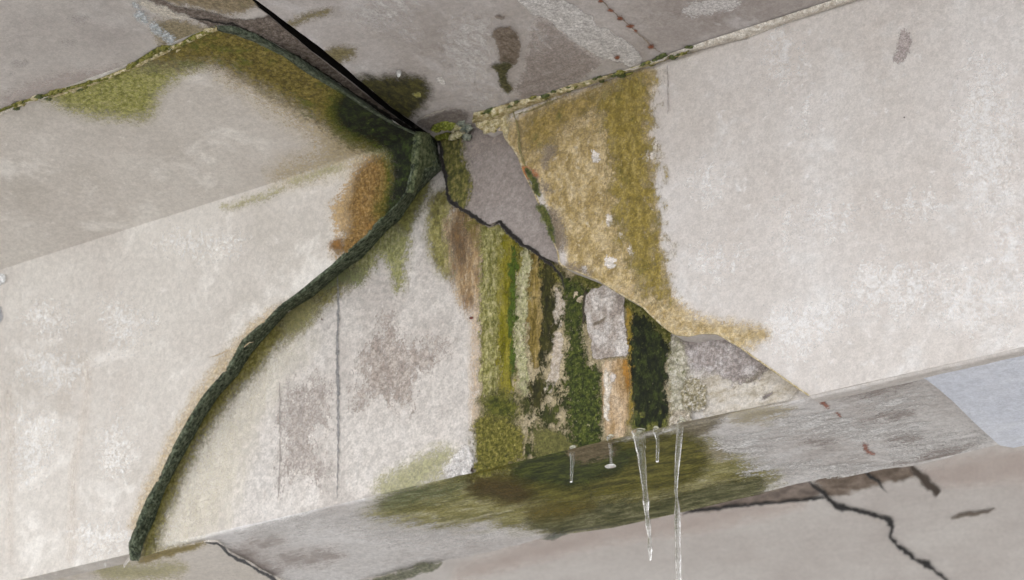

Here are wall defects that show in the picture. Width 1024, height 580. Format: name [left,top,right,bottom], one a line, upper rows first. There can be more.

water stain [445,0,642,102]
water stain [418,109,468,131]
crack [128,0,565,561]
peeling [604,256,617,269]
water stain [67,181,797,562]
spalling [543,284,629,393]
spalling [445,444,474,478]
crack [681,473,947,580]